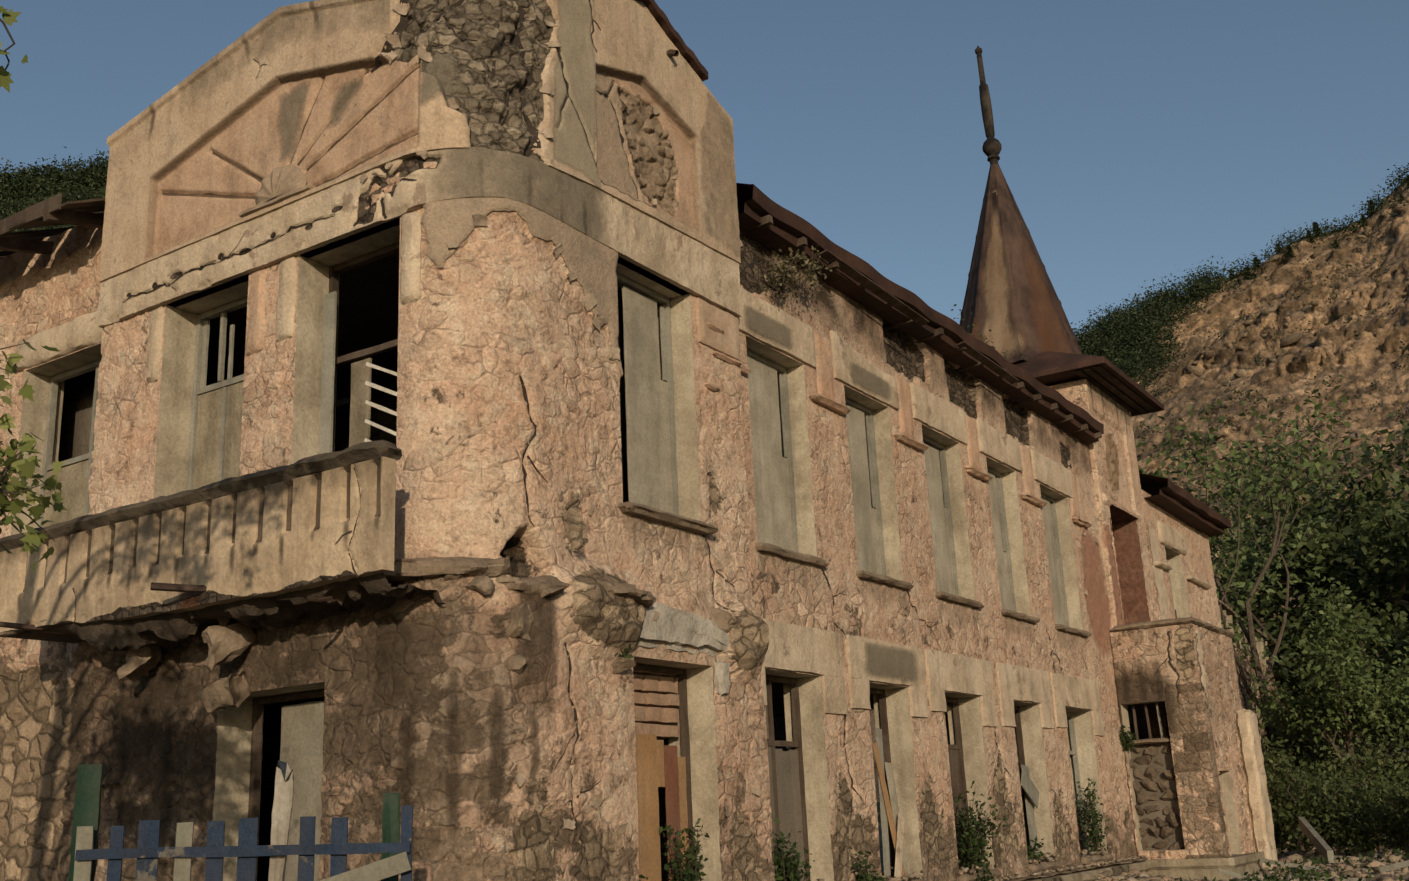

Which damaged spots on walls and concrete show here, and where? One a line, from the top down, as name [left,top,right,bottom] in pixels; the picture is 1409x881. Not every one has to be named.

crack [371,0,638,199]
flaking render [378,0,657,208]
crack [519,375,548,526]
flaking render [56,570,371,624]
crack [554,643,601,881]
crack [1155,631,1179,697]